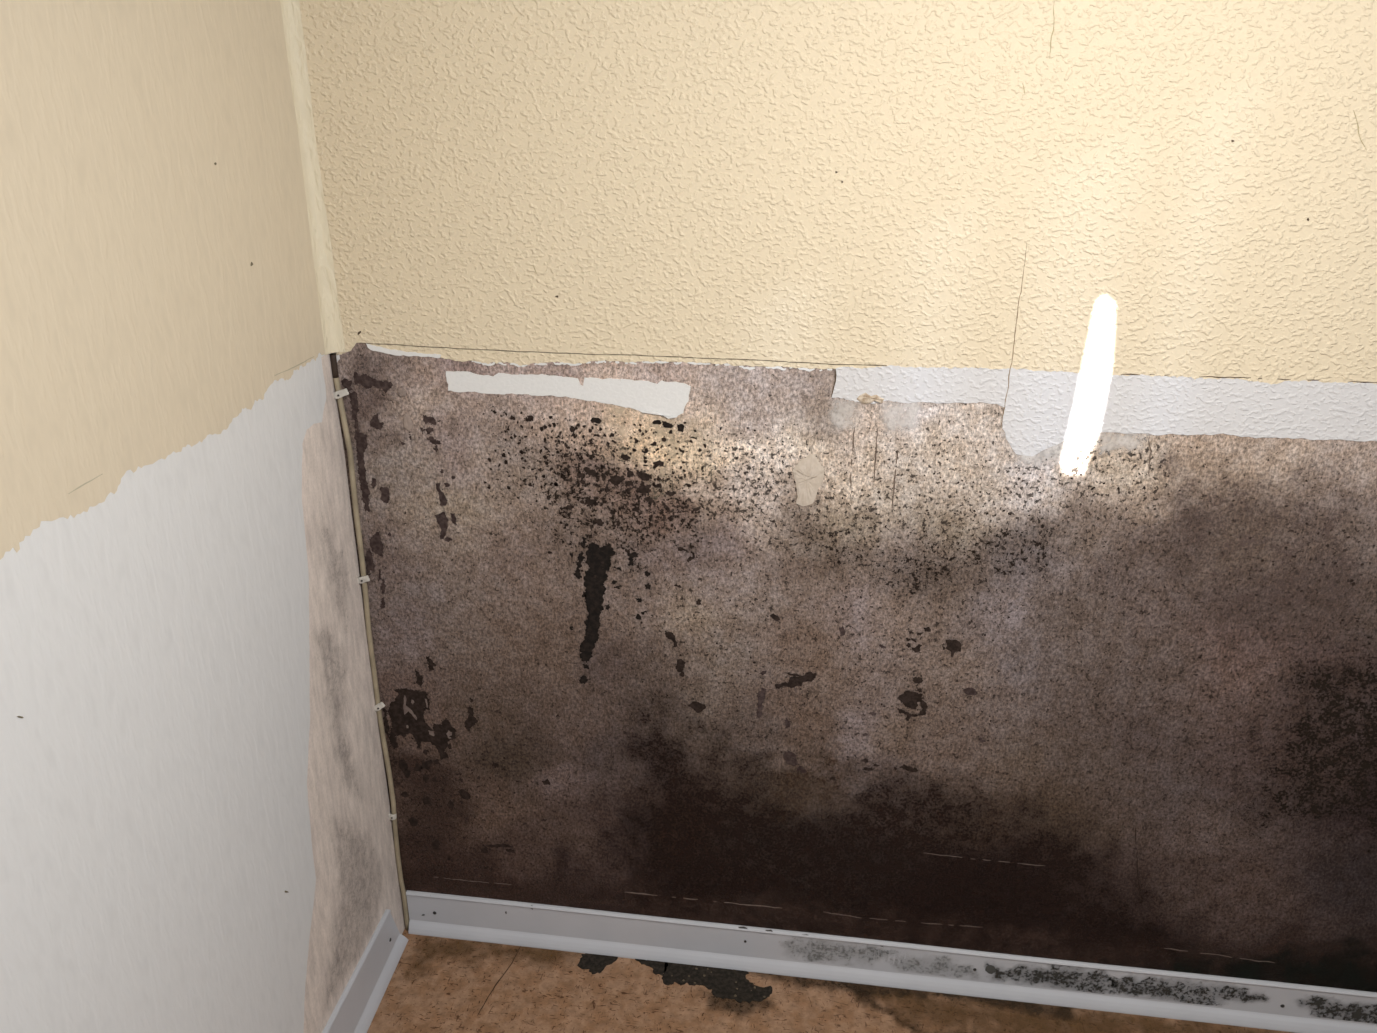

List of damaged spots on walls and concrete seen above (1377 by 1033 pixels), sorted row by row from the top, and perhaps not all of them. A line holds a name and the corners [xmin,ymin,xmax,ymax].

leakage [341,356,393,512]
leakage [364,532,391,609]
peeling [302,343,1377,1033]
leakage [383,395,1377,1033]